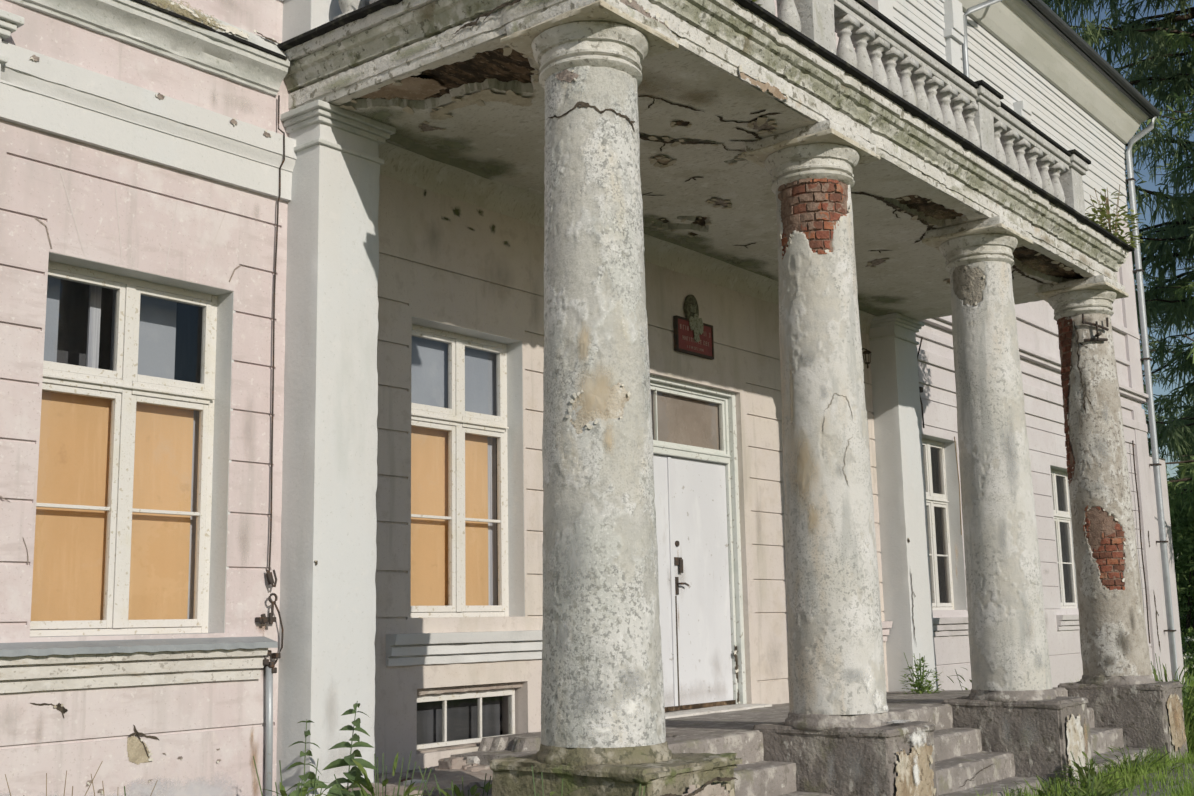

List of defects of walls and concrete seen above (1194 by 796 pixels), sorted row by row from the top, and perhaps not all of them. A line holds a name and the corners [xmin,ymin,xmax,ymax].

flaking render [149,0,281,44]
flaking render [381,47,539,132]
crack [546,95,783,152]
flaking render [778,178,852,259]
crack [851,192,936,253]
flaking render [1012,246,1084,285]
flaking render [1057,317,1076,486]
crack [823,393,853,486]
flaking render [1083,503,1126,590]
flaking render [127,736,183,765]
flaking render [895,742,936,796]
flaking render [1167,694,1187,751]